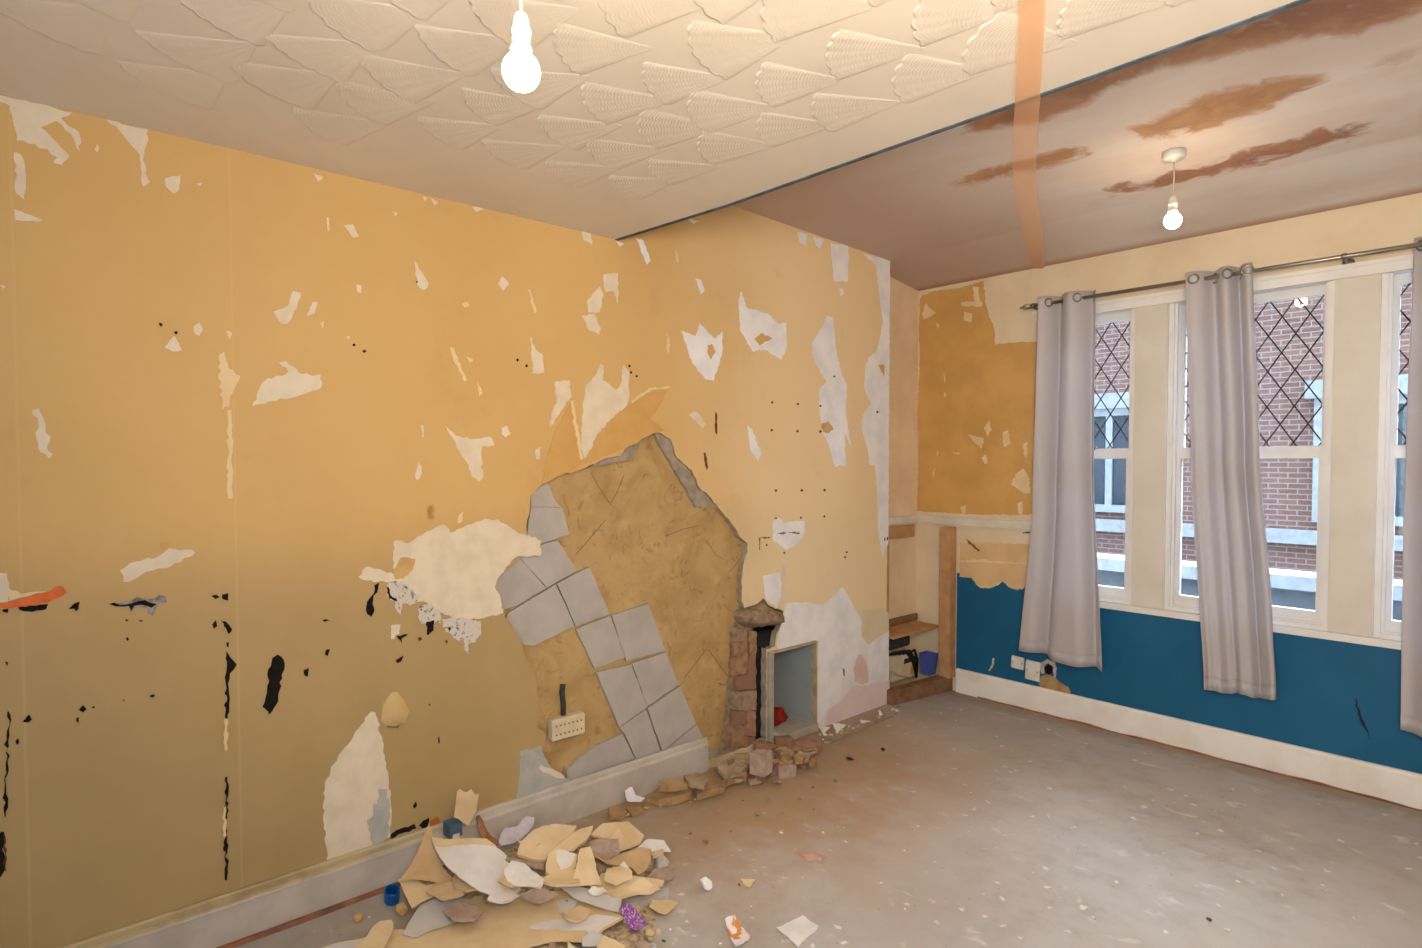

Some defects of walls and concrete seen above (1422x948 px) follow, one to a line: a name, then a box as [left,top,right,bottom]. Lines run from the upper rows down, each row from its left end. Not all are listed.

damp [955,0,1422,142]
damp [945,140,1099,193]
damp [1088,119,1385,200]
peeling [961,287,982,322]
peeling [689,411,761,461]
peeling [797,232,890,557]
peeling [969,421,1030,514]
flaking render [359,426,890,798]
flaking render [323,711,392,860]